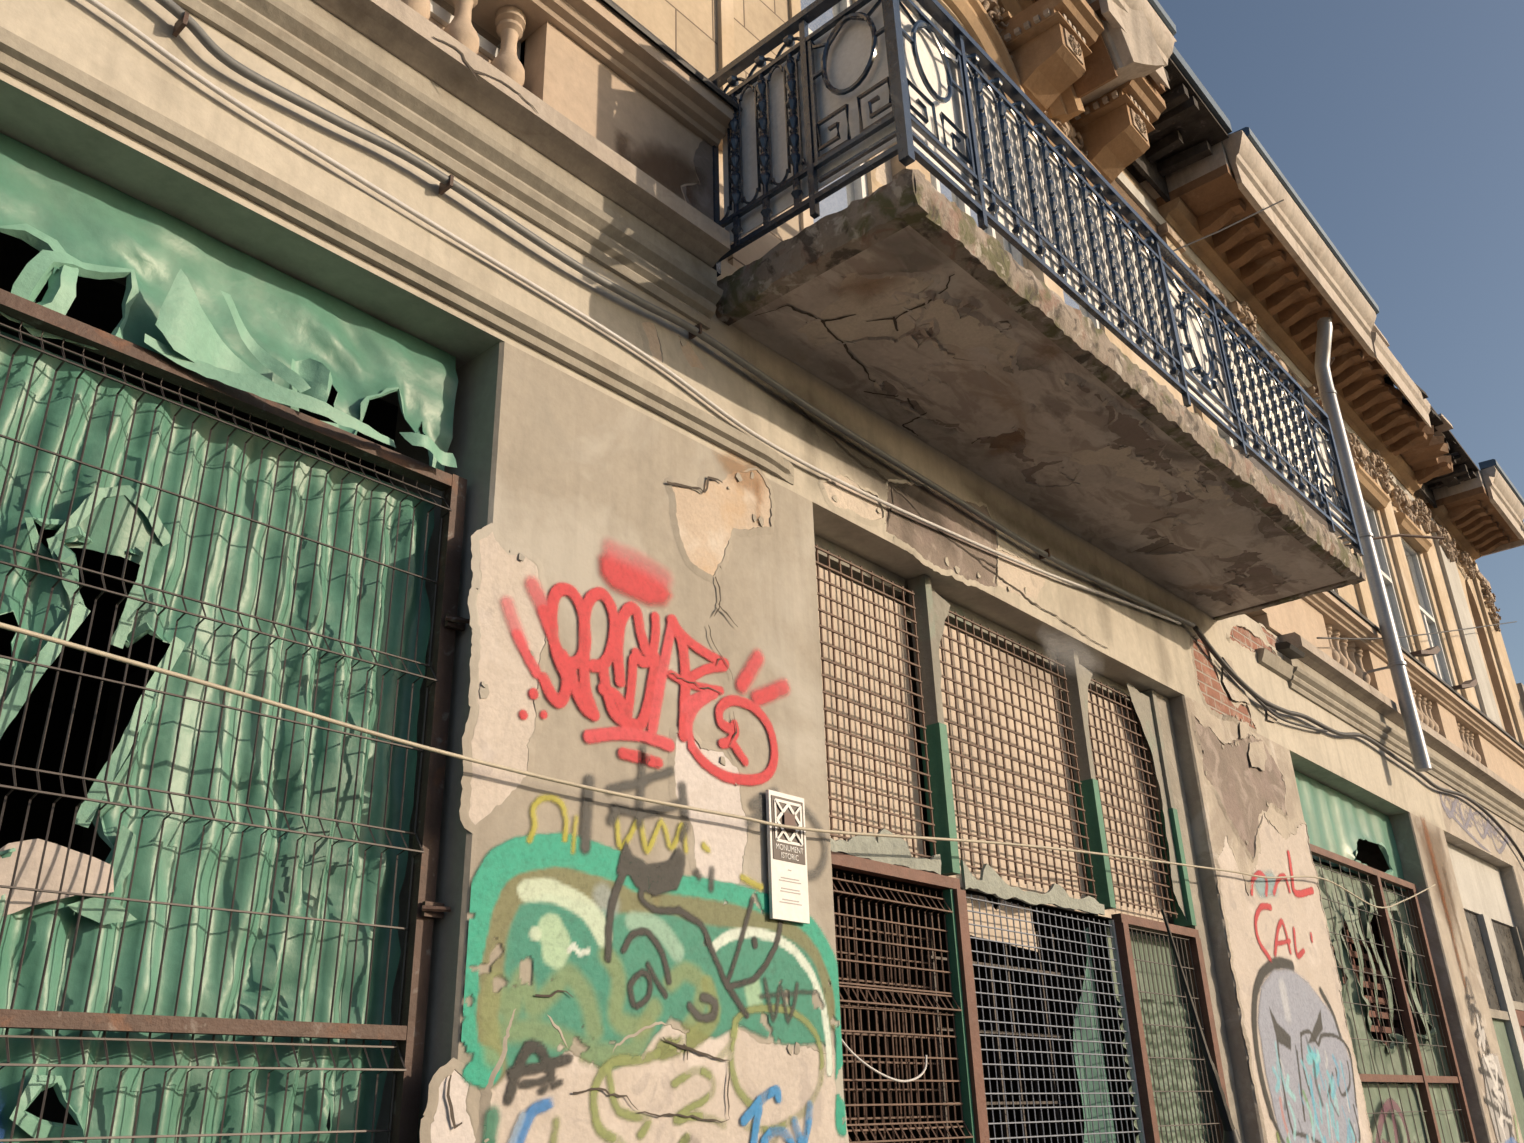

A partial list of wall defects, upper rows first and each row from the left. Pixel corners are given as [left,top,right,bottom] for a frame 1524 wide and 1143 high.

crack [754,274,955,436]
peeling [665,464,775,584]
water stain [776,391,941,526]
peeling [459,523,551,836]
spalling [715,147,1373,1143]
spalling [420,1009,849,1143]